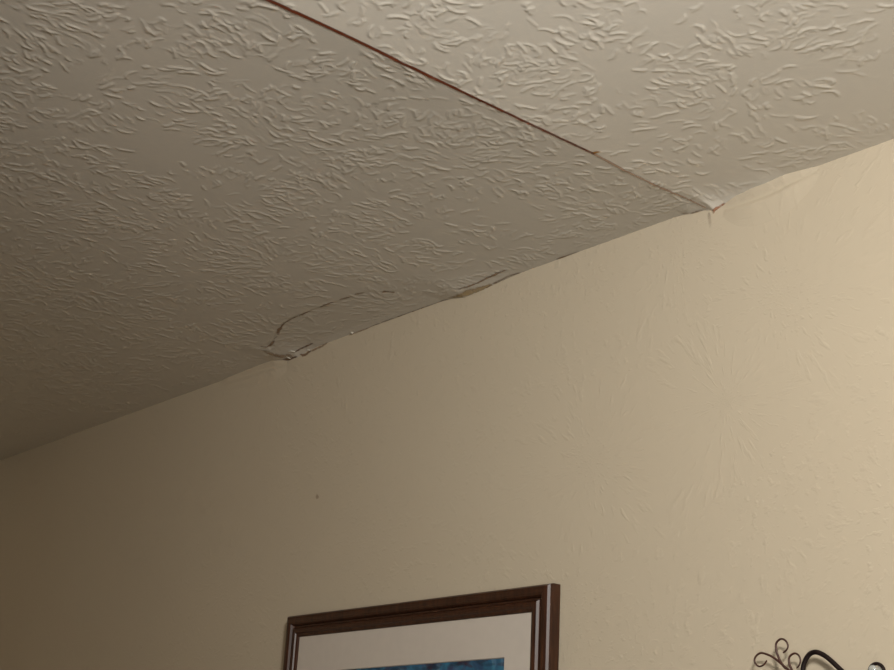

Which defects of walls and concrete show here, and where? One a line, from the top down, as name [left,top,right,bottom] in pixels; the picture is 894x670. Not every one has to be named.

crack [266,0,724,214]
peeling [453,270,519,298]
crack [261,293,360,347]